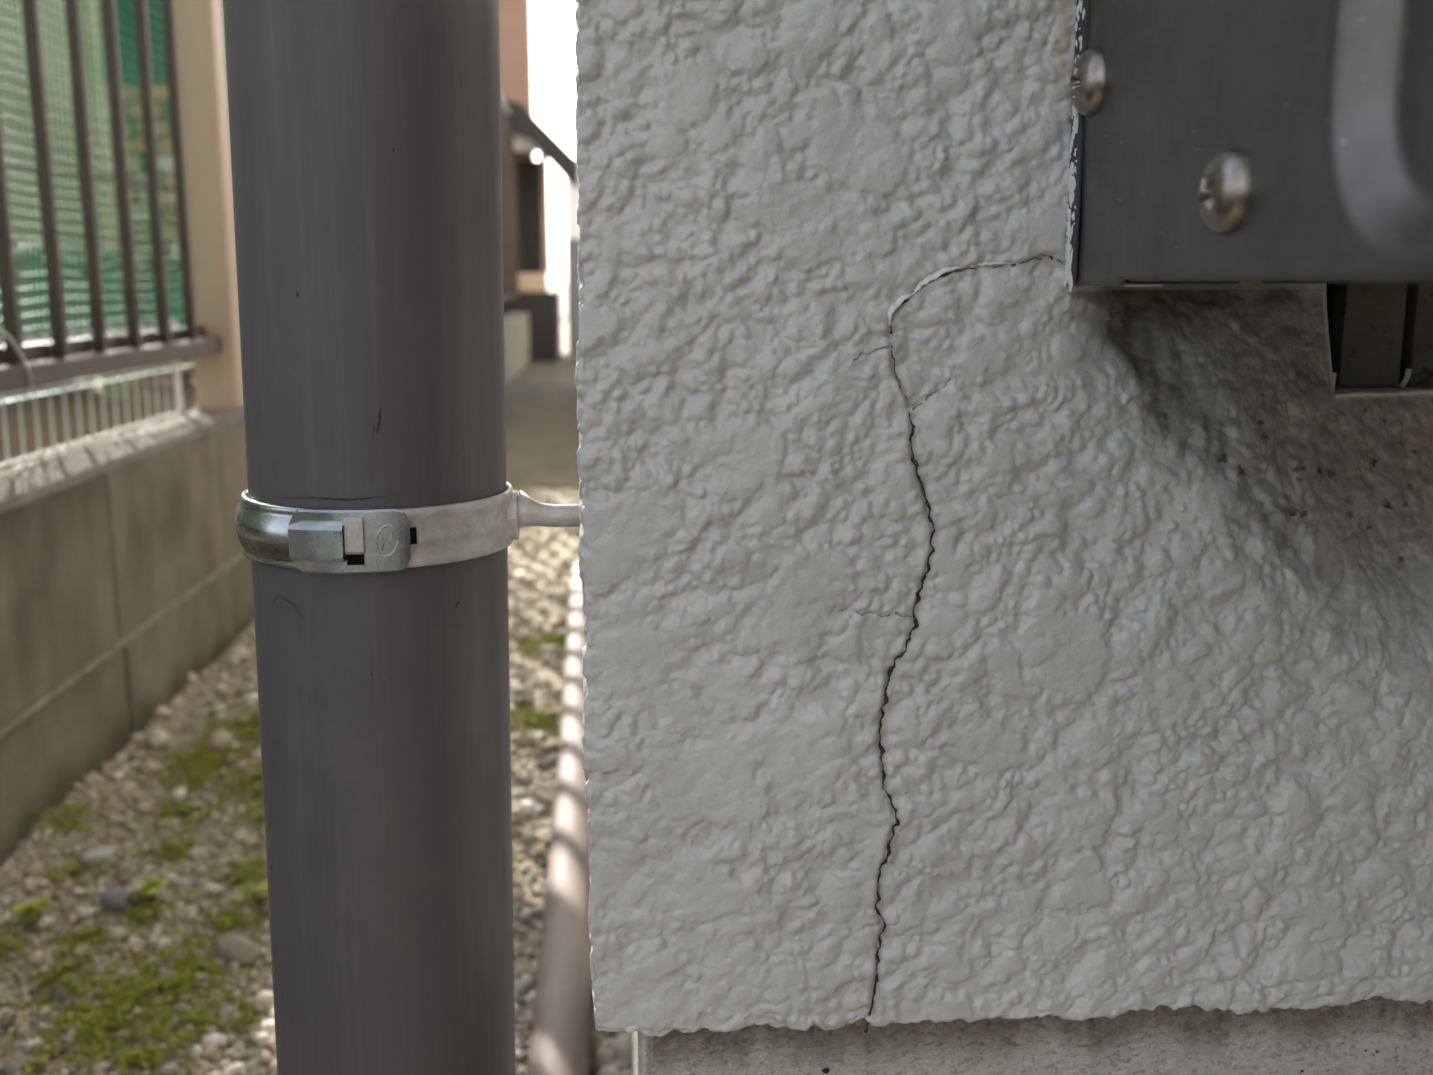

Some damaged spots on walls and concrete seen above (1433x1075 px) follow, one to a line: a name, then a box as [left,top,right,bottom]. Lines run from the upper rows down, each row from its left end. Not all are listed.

crack [837,255,1063,1033]